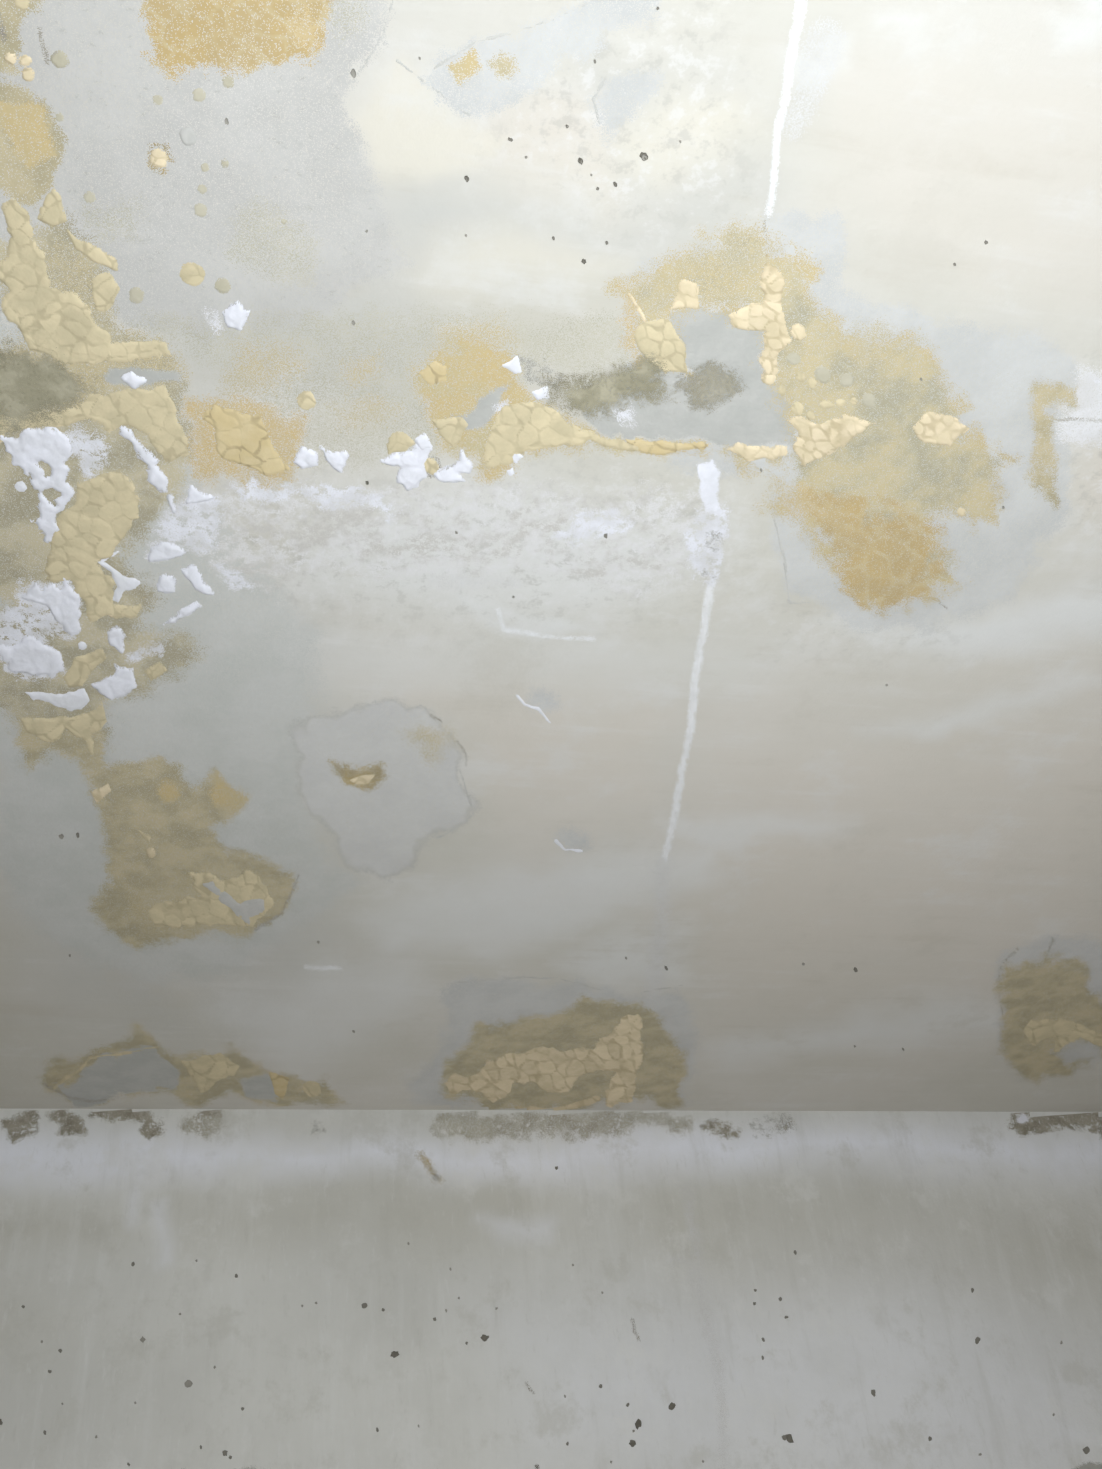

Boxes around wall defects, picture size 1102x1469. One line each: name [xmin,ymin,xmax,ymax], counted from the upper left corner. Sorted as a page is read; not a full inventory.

crack [764,0,851,218]
peeling [574,306,796,448]
water stain [0,0,1080,959]
crack [642,459,731,1000]
spalling [0,1109,225,1145]
spalling [420,1110,797,1153]
spalling [1007,1112,1102,1140]